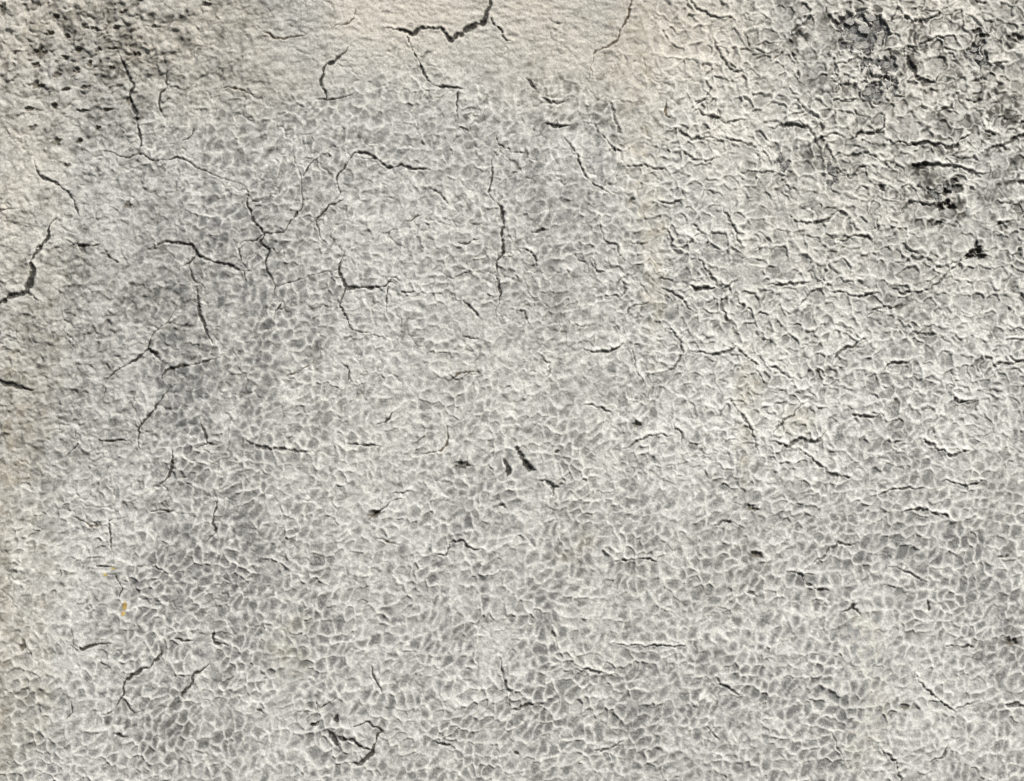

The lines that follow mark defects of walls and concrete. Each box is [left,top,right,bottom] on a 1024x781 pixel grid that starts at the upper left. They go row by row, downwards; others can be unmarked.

crack [317,9,356,100]
crack [386,0,511,122]
crack [590,0,632,77]
crack [0,160,118,304]
crack [67,52,449,455]
crack [459,134,546,339]
crack [105,629,229,738]
crack [310,698,383,766]